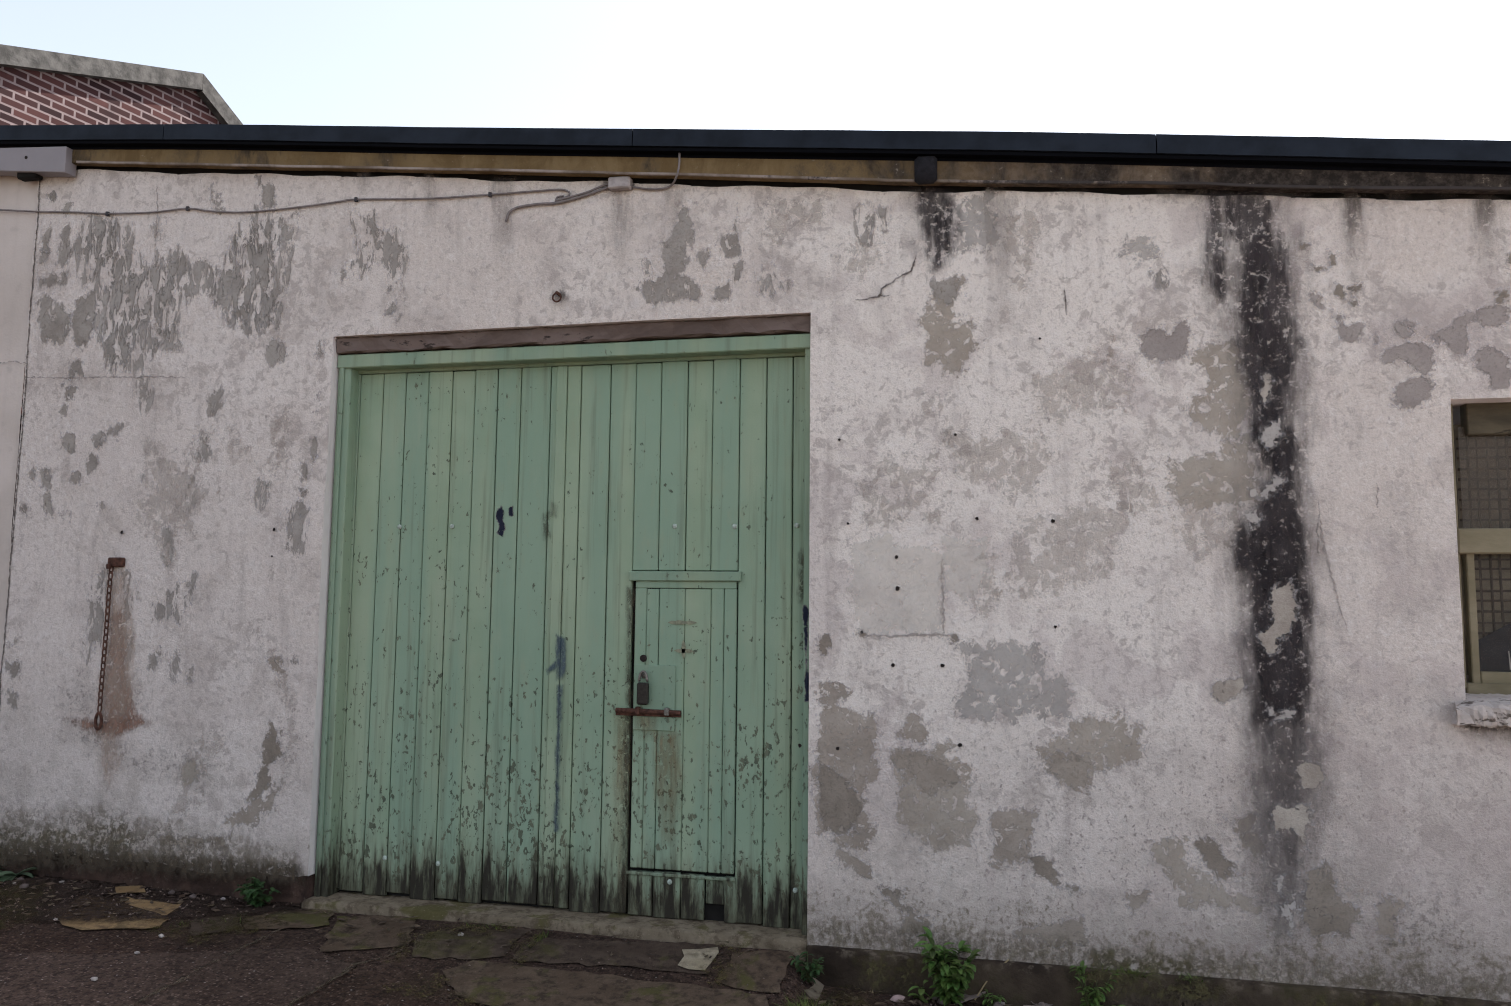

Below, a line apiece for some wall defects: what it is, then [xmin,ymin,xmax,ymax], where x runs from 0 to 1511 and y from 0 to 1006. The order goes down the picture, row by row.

peeling [36,175,299,484]
peeling [636,207,743,305]
peeling [853,204,891,247]
leakage [918,186,955,269]
peeling [918,274,980,378]
peeling [1300,243,1511,412]
peeling [271,436,317,557]
leakage [1158,189,1315,875]
corrosion [75,611,145,737]
peeling [947,632,1147,795]
peeling [798,681,1081,941]
peeling [1149,761,1325,915]